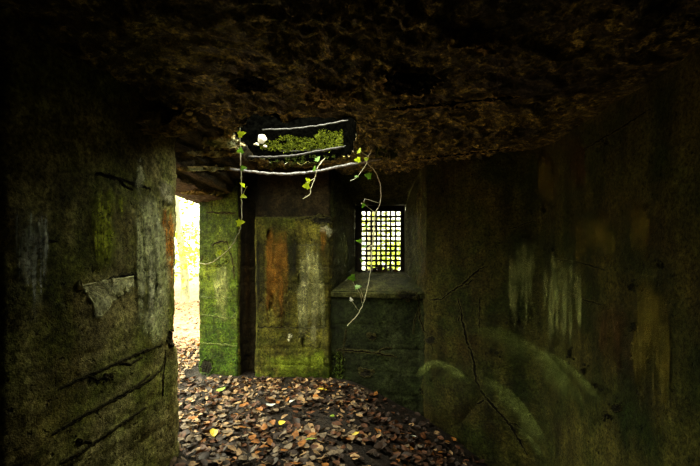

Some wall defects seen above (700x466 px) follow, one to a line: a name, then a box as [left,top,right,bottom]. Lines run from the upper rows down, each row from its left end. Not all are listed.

corrosion [163,210,174,271]
peeling [77,276,134,318]
water stain [543,262,581,332]
crack [52,343,167,435]
crack [456,298,528,455]
crack [60,406,147,465]